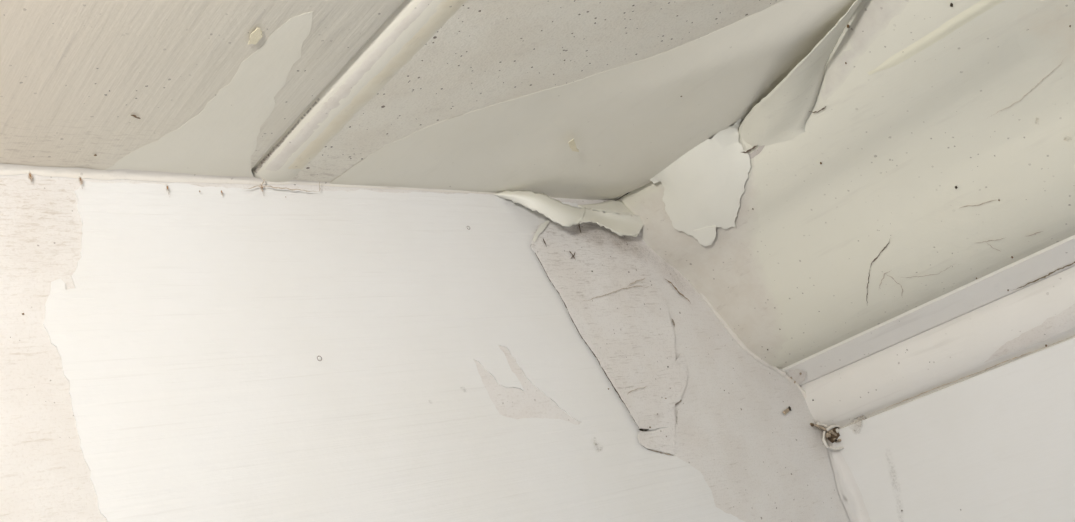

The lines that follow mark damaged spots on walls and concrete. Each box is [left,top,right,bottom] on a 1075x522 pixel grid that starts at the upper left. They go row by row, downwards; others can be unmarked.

peeling [0,178,107,522]
peeling [493,0,910,522]
crack [866,239,952,303]